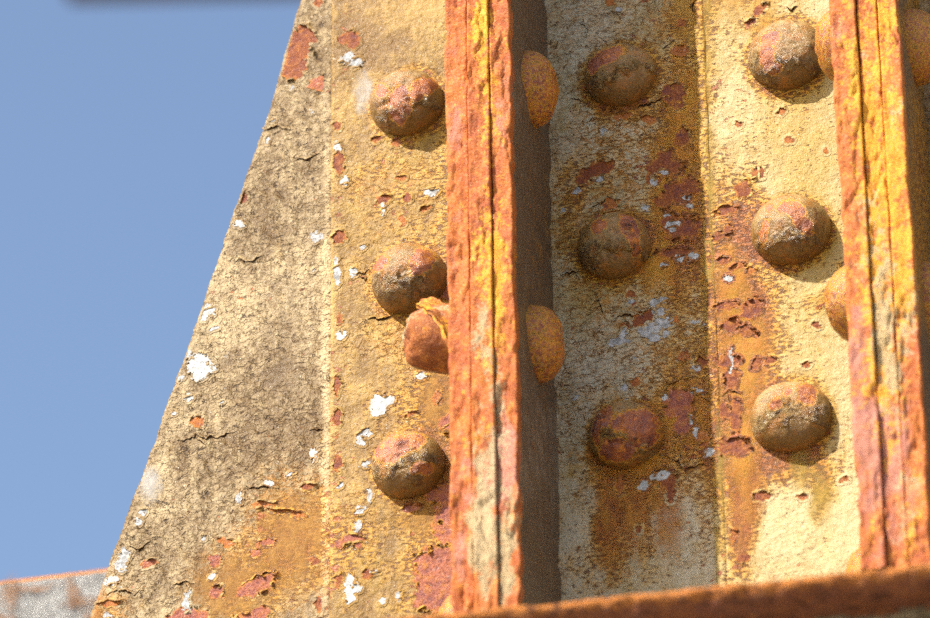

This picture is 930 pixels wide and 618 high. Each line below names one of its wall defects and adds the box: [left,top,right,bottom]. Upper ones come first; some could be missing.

rust [281,21,324,91]
rust [334,27,363,52]
rust [619,287,657,330]
peeling [605,293,676,350]
rust [643,67,779,566]
peeling [309,446,320,463]
peeling [264,468,298,488]
rust [632,456,683,506]
peeling [104,546,134,588]
peeling [205,570,218,582]
rust [399,475,453,616]
peeling [181,587,194,615]